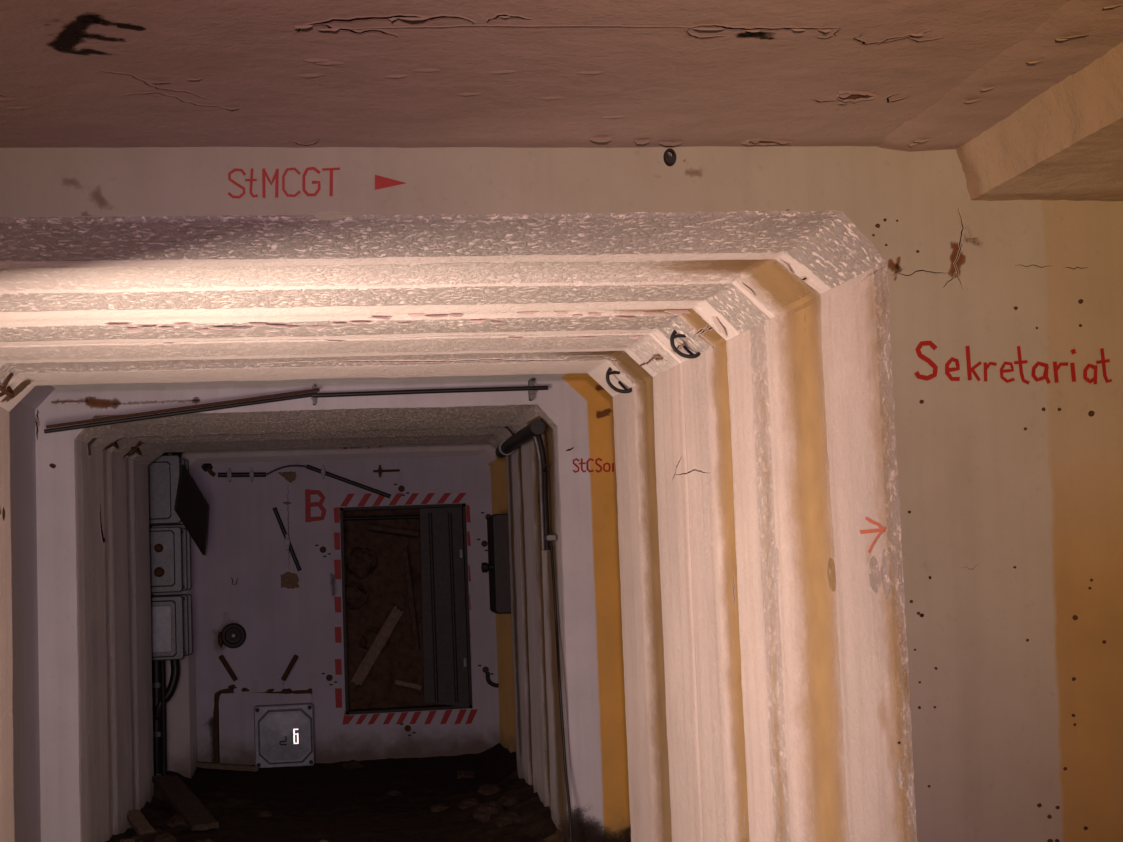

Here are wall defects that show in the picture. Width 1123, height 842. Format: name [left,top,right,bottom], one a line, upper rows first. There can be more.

spalling [813,90,877,106]
crack [941,208,965,290]
peeling [106,311,540,333]